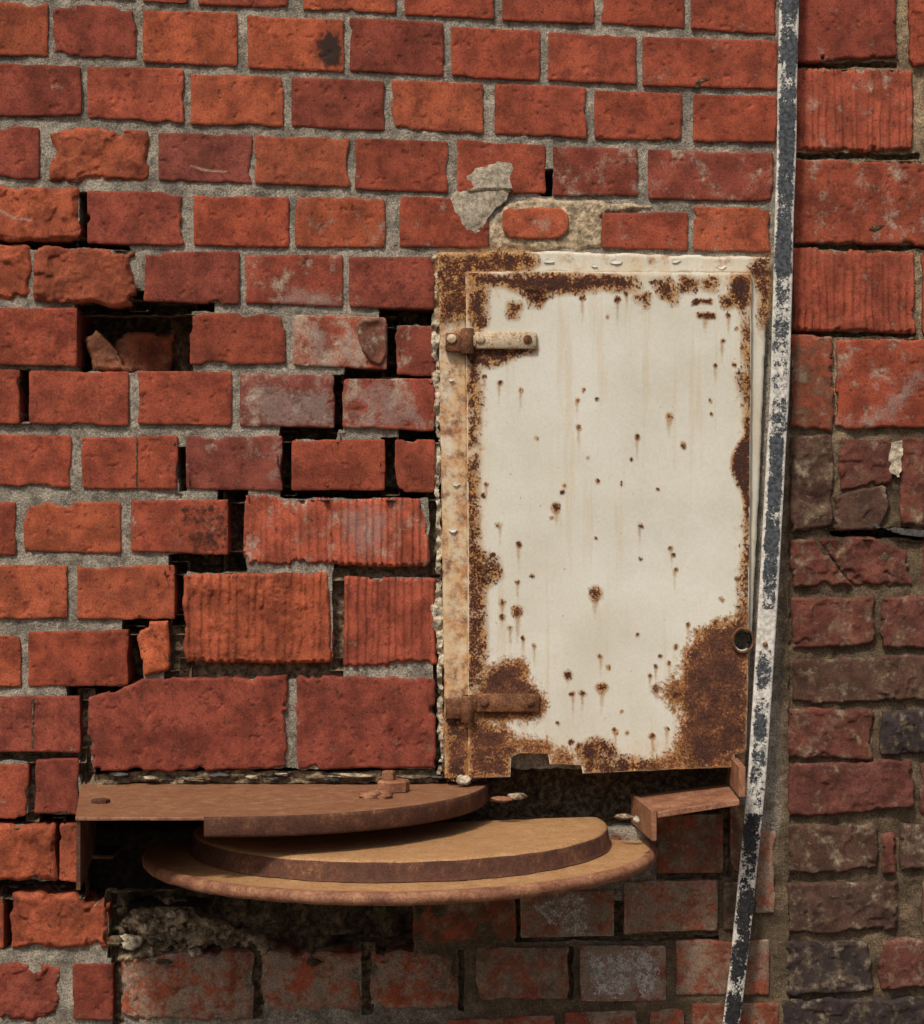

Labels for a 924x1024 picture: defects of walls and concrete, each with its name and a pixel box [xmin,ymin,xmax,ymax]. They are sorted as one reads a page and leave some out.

spalling [78,303,198,373]
crack [0,303,442,829]
rust [432,247,774,781]
crack [825,526,920,543]
crack [431,653,444,774]
crack [0,872,90,949]
spalling [107,896,277,962]